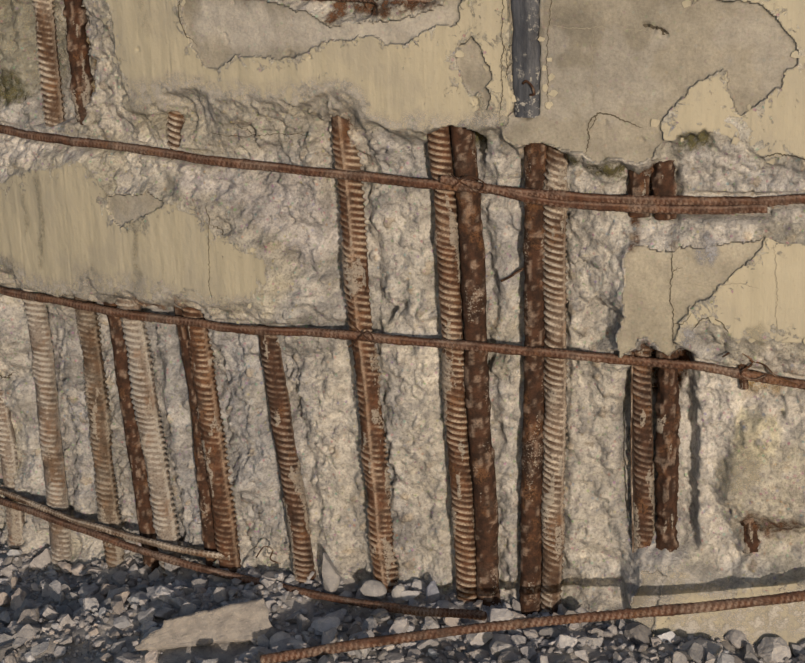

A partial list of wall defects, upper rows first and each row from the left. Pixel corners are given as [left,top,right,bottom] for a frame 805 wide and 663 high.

rust [325,0,435,23]
peeling [0,0,805,198]
crack [546,0,669,153]
crack [205,207,224,297]
crack [669,248,756,344]
crack [772,245,780,336]
spalling [0,133,805,663]
rust [630,344,694,552]
rust [740,514,802,554]